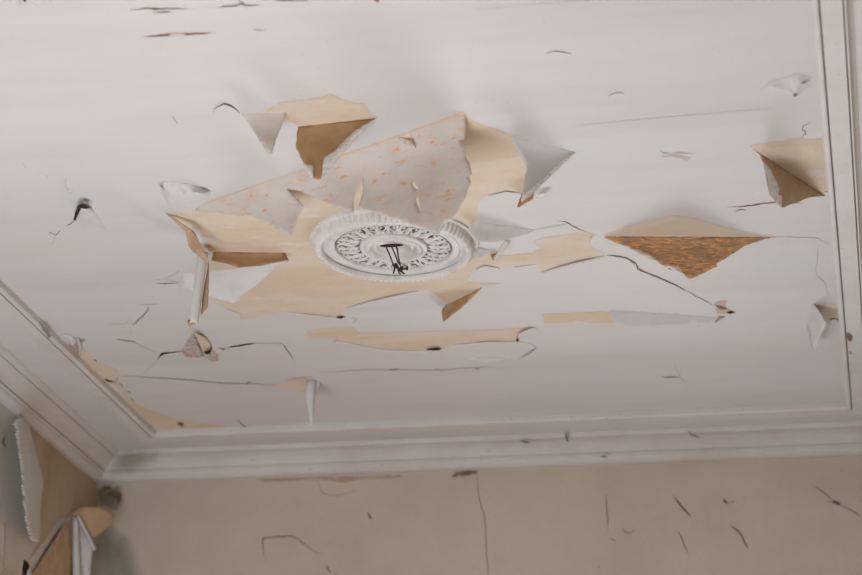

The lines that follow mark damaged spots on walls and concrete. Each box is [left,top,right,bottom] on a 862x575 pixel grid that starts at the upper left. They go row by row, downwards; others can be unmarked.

peeling [750,124,828,208]
peeling [48,204,107,245]
peeling [166,94,776,358]
peeling [59,334,224,430]
crack [117,334,261,385]
crack [219,343,294,360]
peeling [806,303,839,352]
peeling [13,414,115,575]
crack [476,471,489,573]